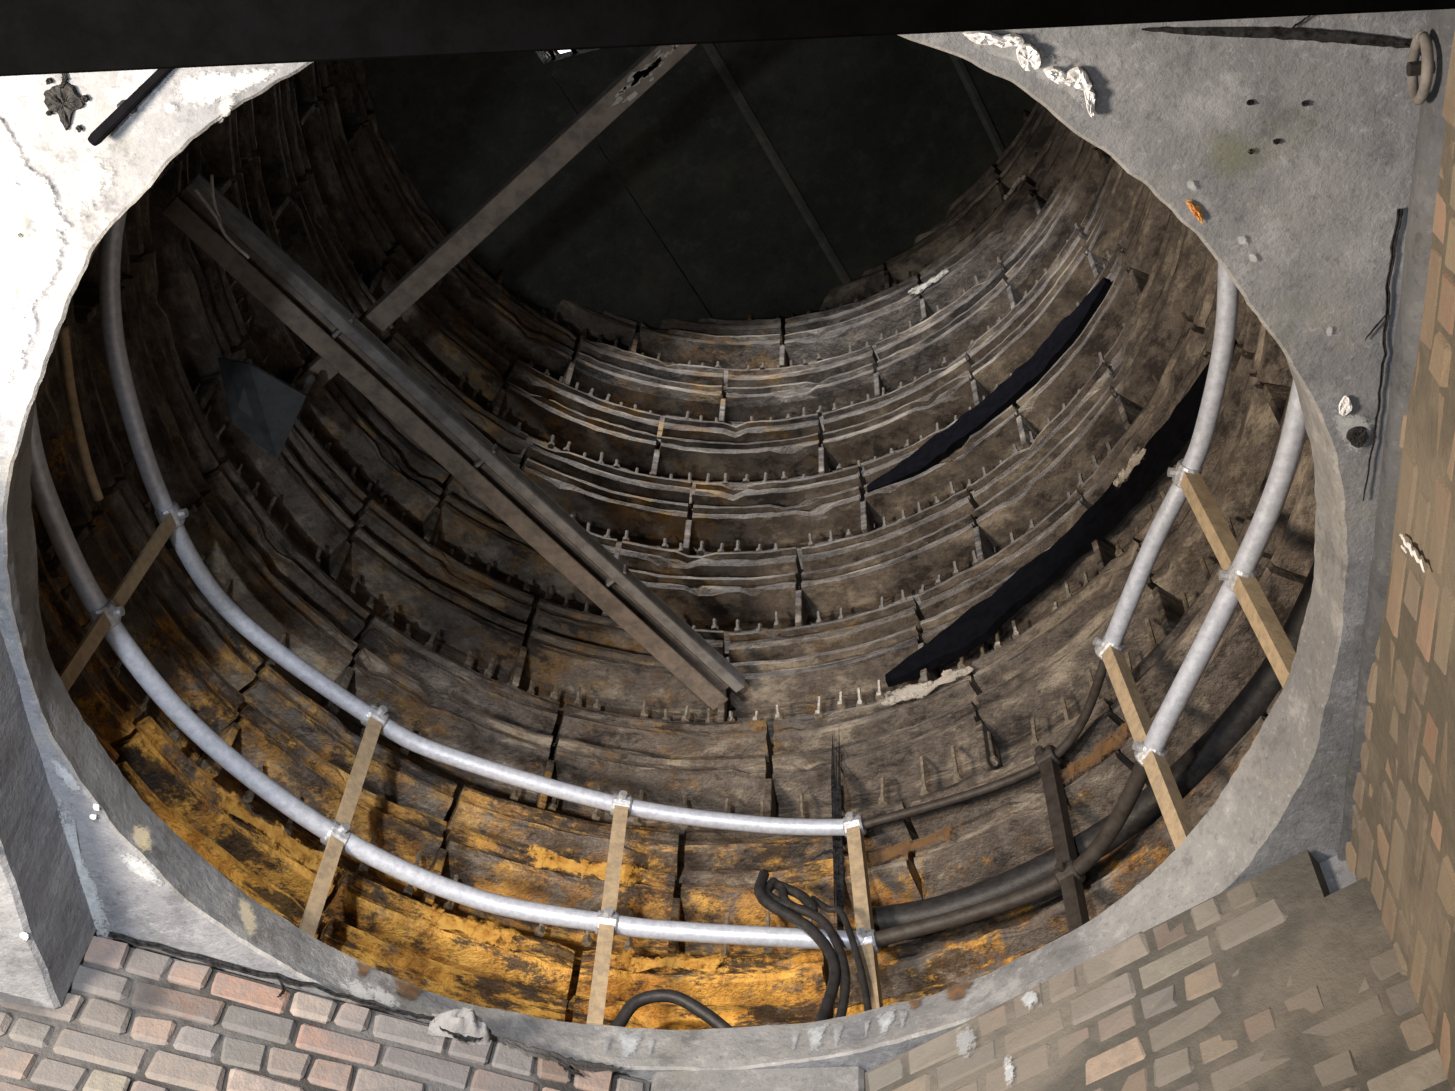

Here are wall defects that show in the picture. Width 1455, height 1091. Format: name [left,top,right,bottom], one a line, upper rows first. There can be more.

peeling [962,31,1095,117]
crack [1142,16,1421,56]
damp [0,121,114,384]
crack [1362,208,1403,501]
crack [107,932,433,1021]